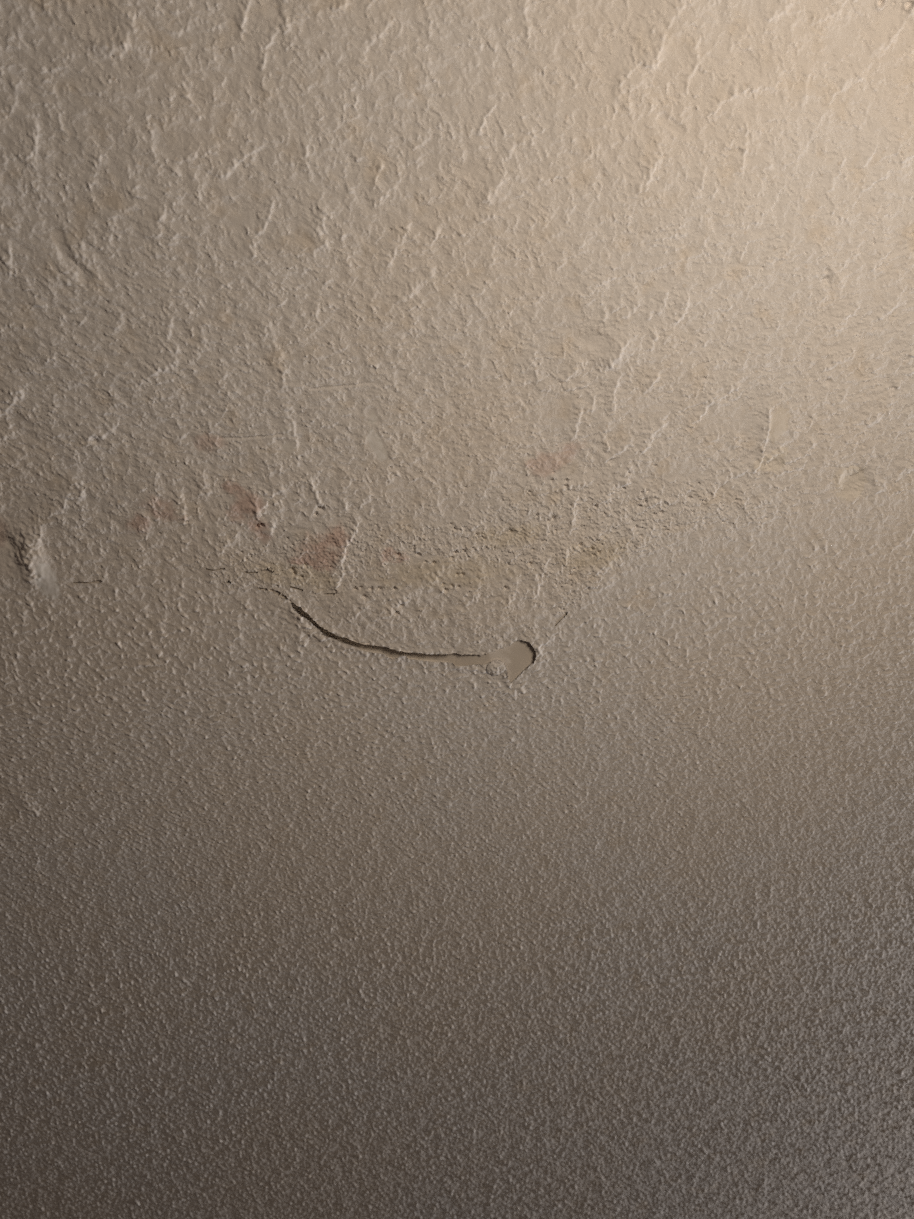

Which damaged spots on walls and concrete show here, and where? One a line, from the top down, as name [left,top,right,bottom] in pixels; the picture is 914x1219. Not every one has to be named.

crack [71,578,102,587]
crack [206,564,570,692]